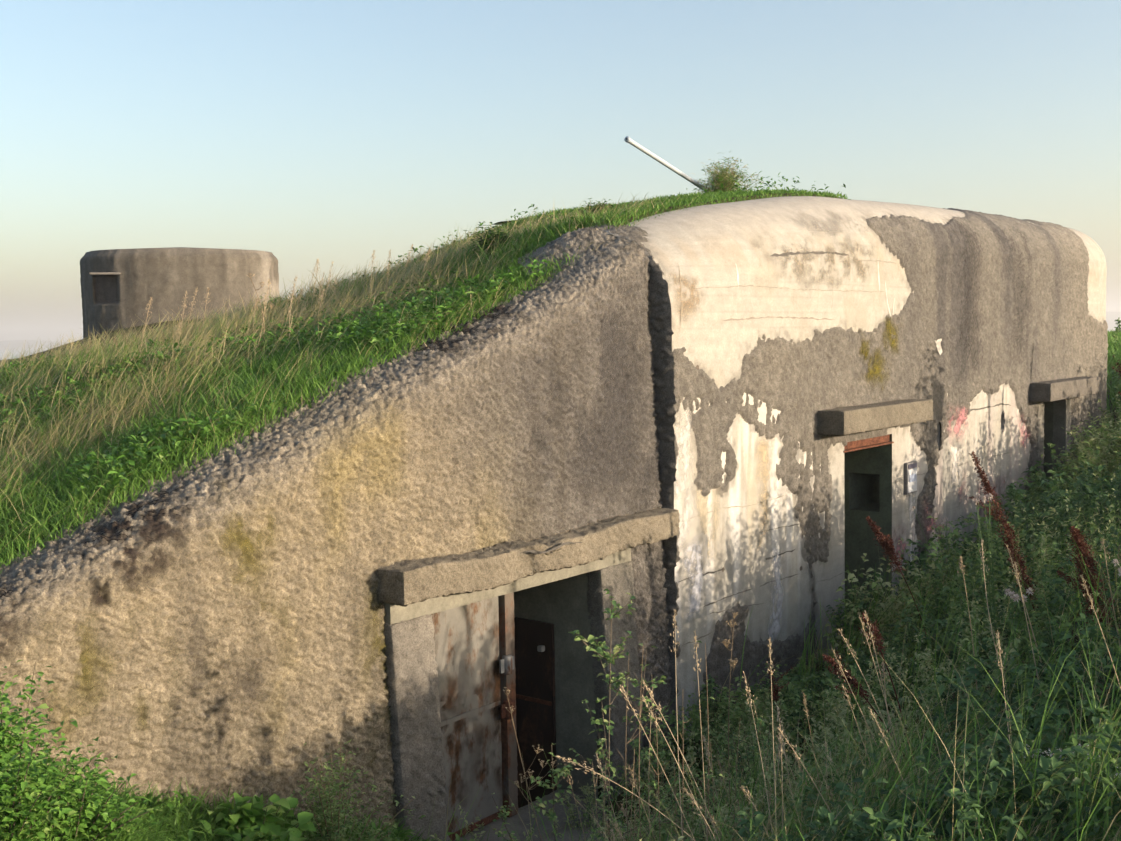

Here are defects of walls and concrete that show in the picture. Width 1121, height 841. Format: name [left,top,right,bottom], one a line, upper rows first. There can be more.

peeling [627,196,965,388]
peeling [673,393,845,748]
peeling [887,383,1031,616]
rust [441,681,463,756]
rust [475,661,501,708]